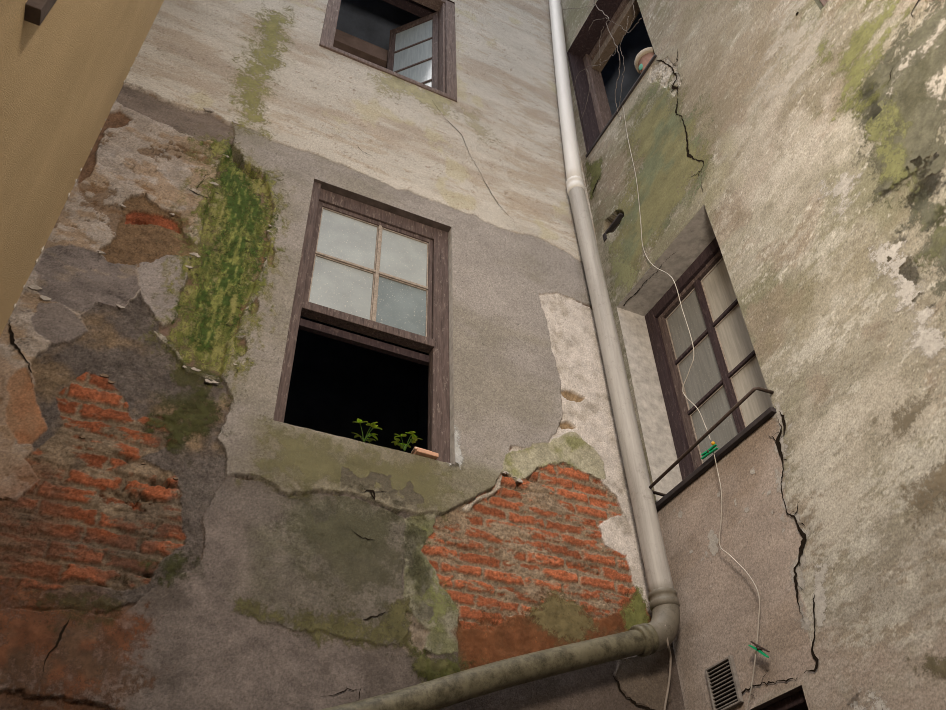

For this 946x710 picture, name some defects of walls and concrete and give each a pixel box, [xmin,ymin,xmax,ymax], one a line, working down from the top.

crack [654,49,704,192]
water stain [864,18,946,198]
peeling [0,82,259,614]
spalling [411,447,439,460]
spalling [421,291,652,631]
crack [741,412,819,698]